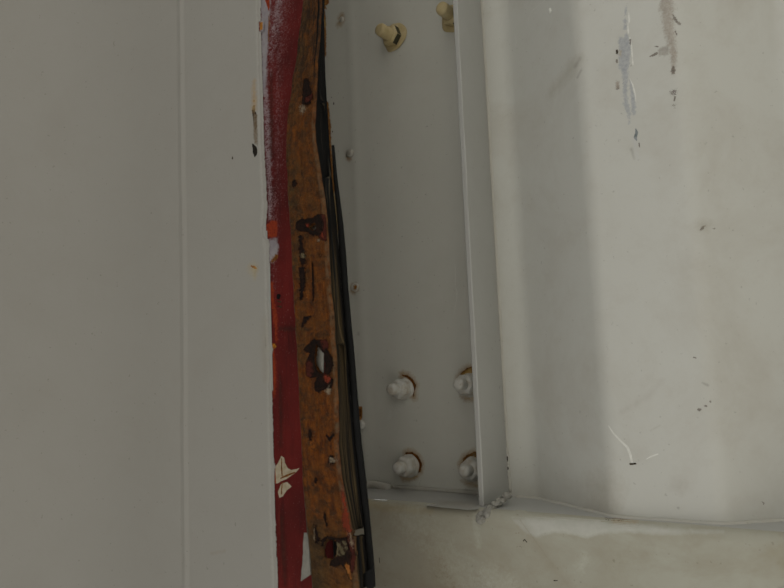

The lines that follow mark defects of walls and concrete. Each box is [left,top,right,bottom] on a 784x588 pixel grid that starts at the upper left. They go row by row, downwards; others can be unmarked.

peeling [614,3,642,163]
peeling [248,0,303,588]
peeling [295,214,327,301]
rust [452,360,472,382]
rust [397,444,428,485]
rust [454,444,478,490]